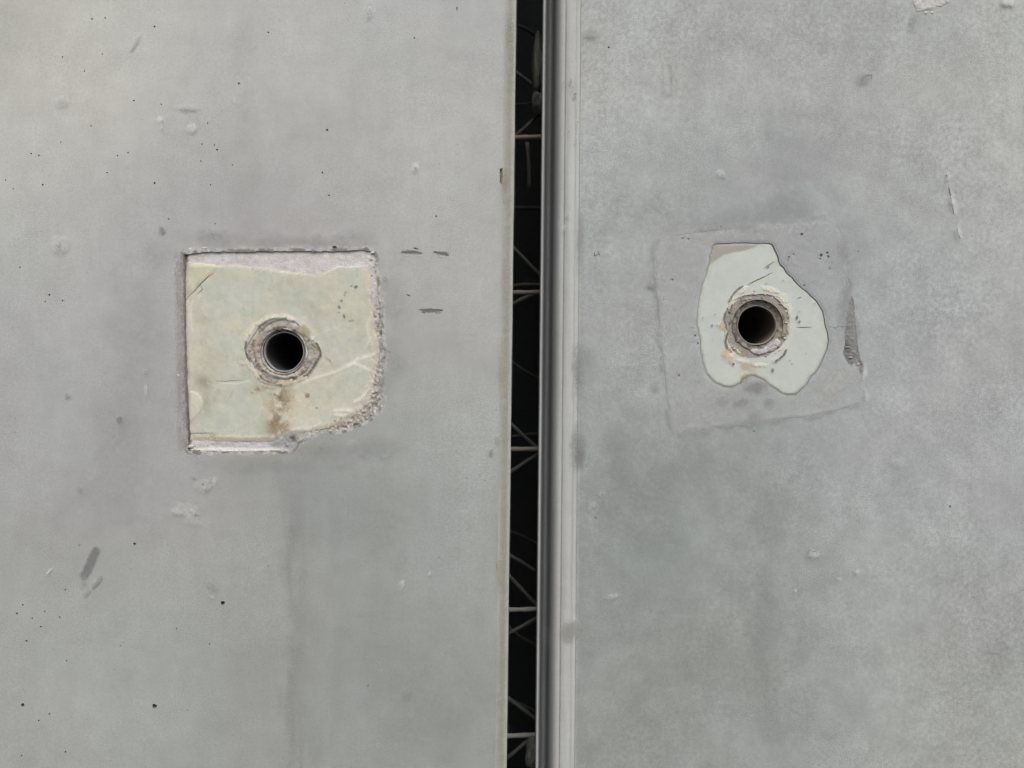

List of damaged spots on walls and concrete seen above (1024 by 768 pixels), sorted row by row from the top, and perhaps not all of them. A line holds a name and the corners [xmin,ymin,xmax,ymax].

spalling [172,246,391,456]
peeling [843,296,864,376]
rust [251,386,291,435]